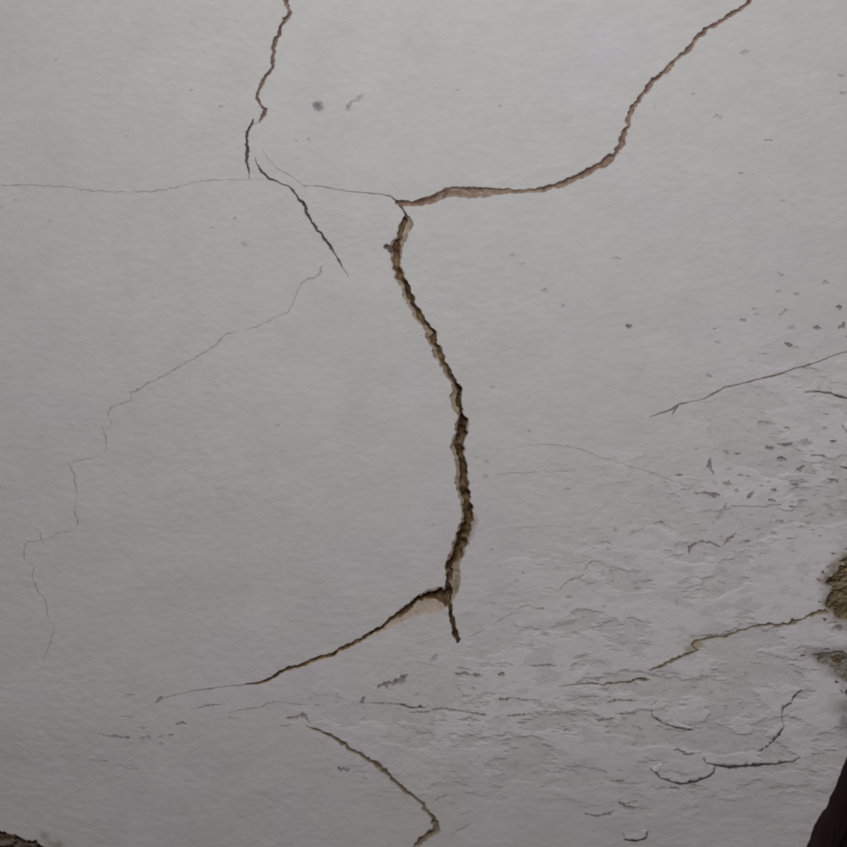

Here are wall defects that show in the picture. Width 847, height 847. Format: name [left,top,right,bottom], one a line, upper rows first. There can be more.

crack [2,0,752,703]
crack [650,352,846,417]
flaking render [817,549,847,631]
crack [558,607,835,687]
flaking render [800,648,847,695]
crack [306,725,441,847]
flaking render [0,831,44,847]